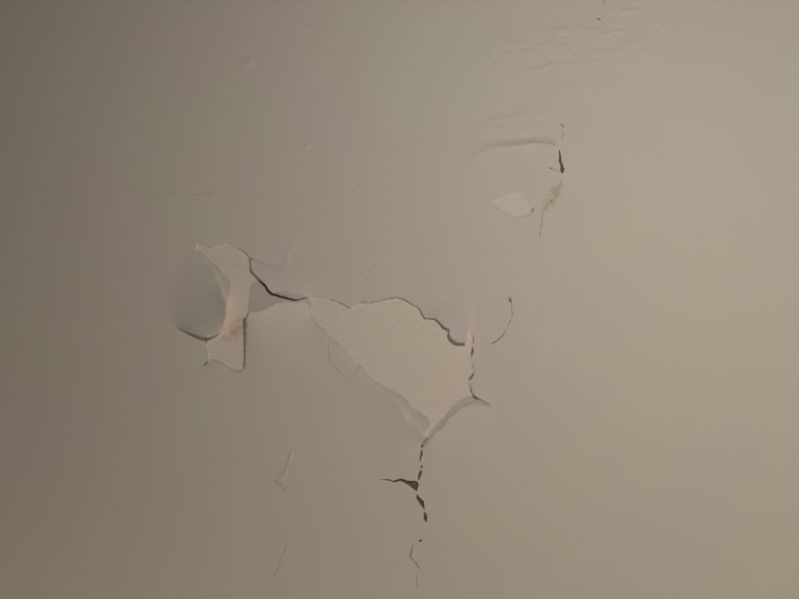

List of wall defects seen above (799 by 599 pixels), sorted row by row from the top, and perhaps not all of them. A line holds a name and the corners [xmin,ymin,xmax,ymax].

peeling [161,242,501,466]
crack [380,438,429,542]